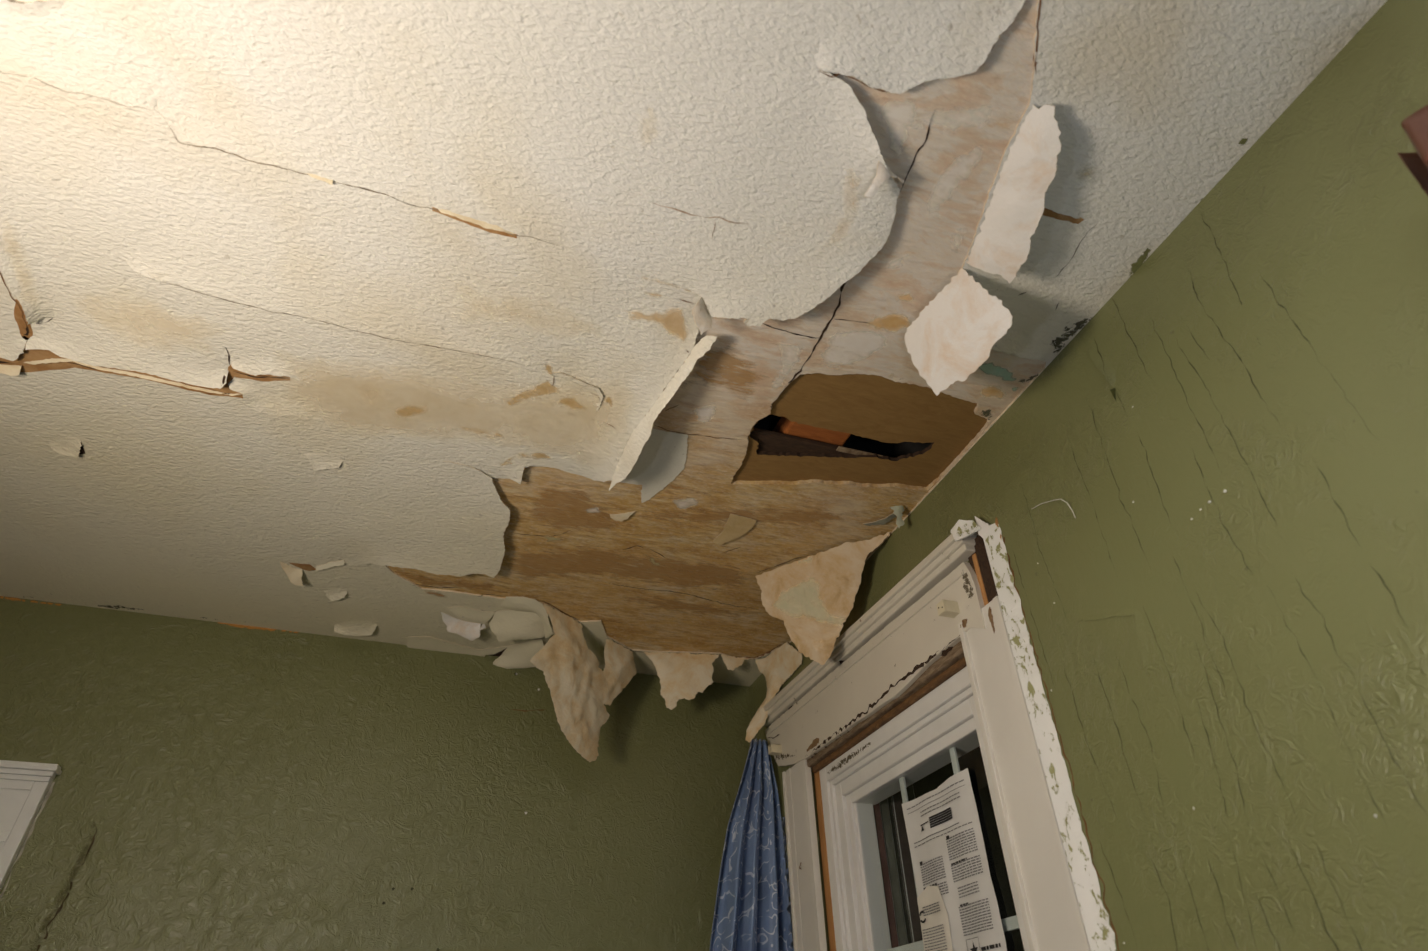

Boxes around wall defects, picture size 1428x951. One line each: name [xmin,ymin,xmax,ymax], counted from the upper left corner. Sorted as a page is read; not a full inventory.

peeling [0,0,67,18]
peeling [0,150,325,422]
crack [0,71,439,211]
crack [222,347,284,394]
peeling [126,0,1050,669]
crack [654,203,746,236]
crack [764,280,872,408]
crack [900,113,934,191]
crack [1071,217,1428,951]
spalling [776,619,967,759]
spalling [982,523,1116,951]
crack [1003,484,1164,951]